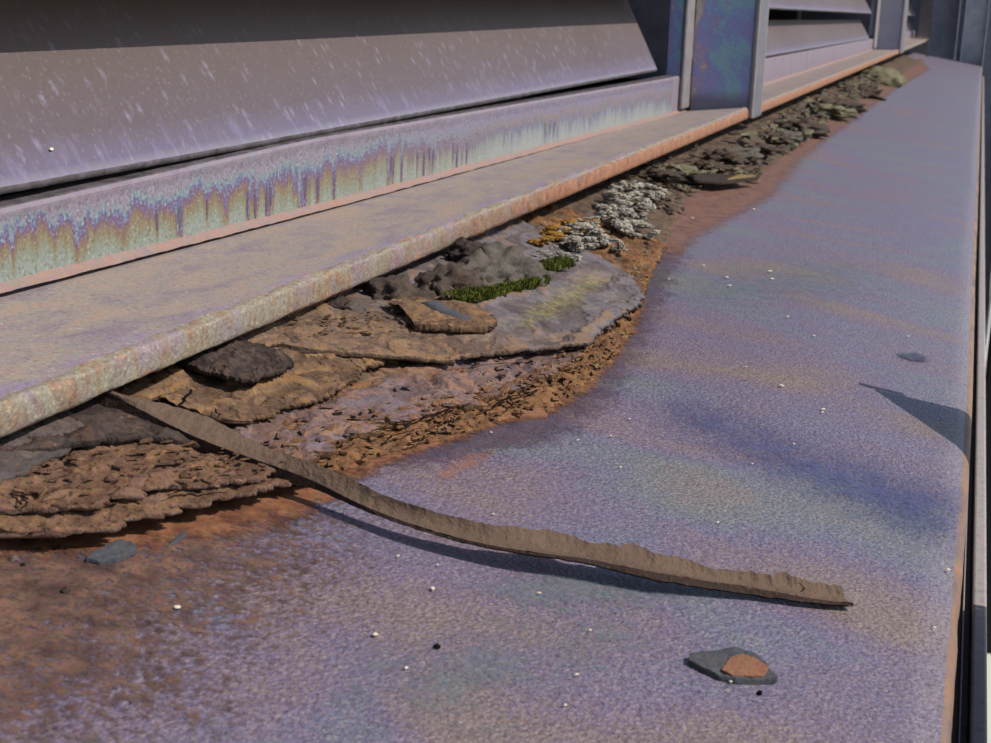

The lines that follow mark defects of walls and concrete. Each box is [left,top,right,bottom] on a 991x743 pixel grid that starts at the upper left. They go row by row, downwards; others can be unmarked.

damp [0,82,673,283]
rust [112,51,928,479]
rust [0,399,365,743]
peeling [93,390,854,607]
rust [689,646,778,685]